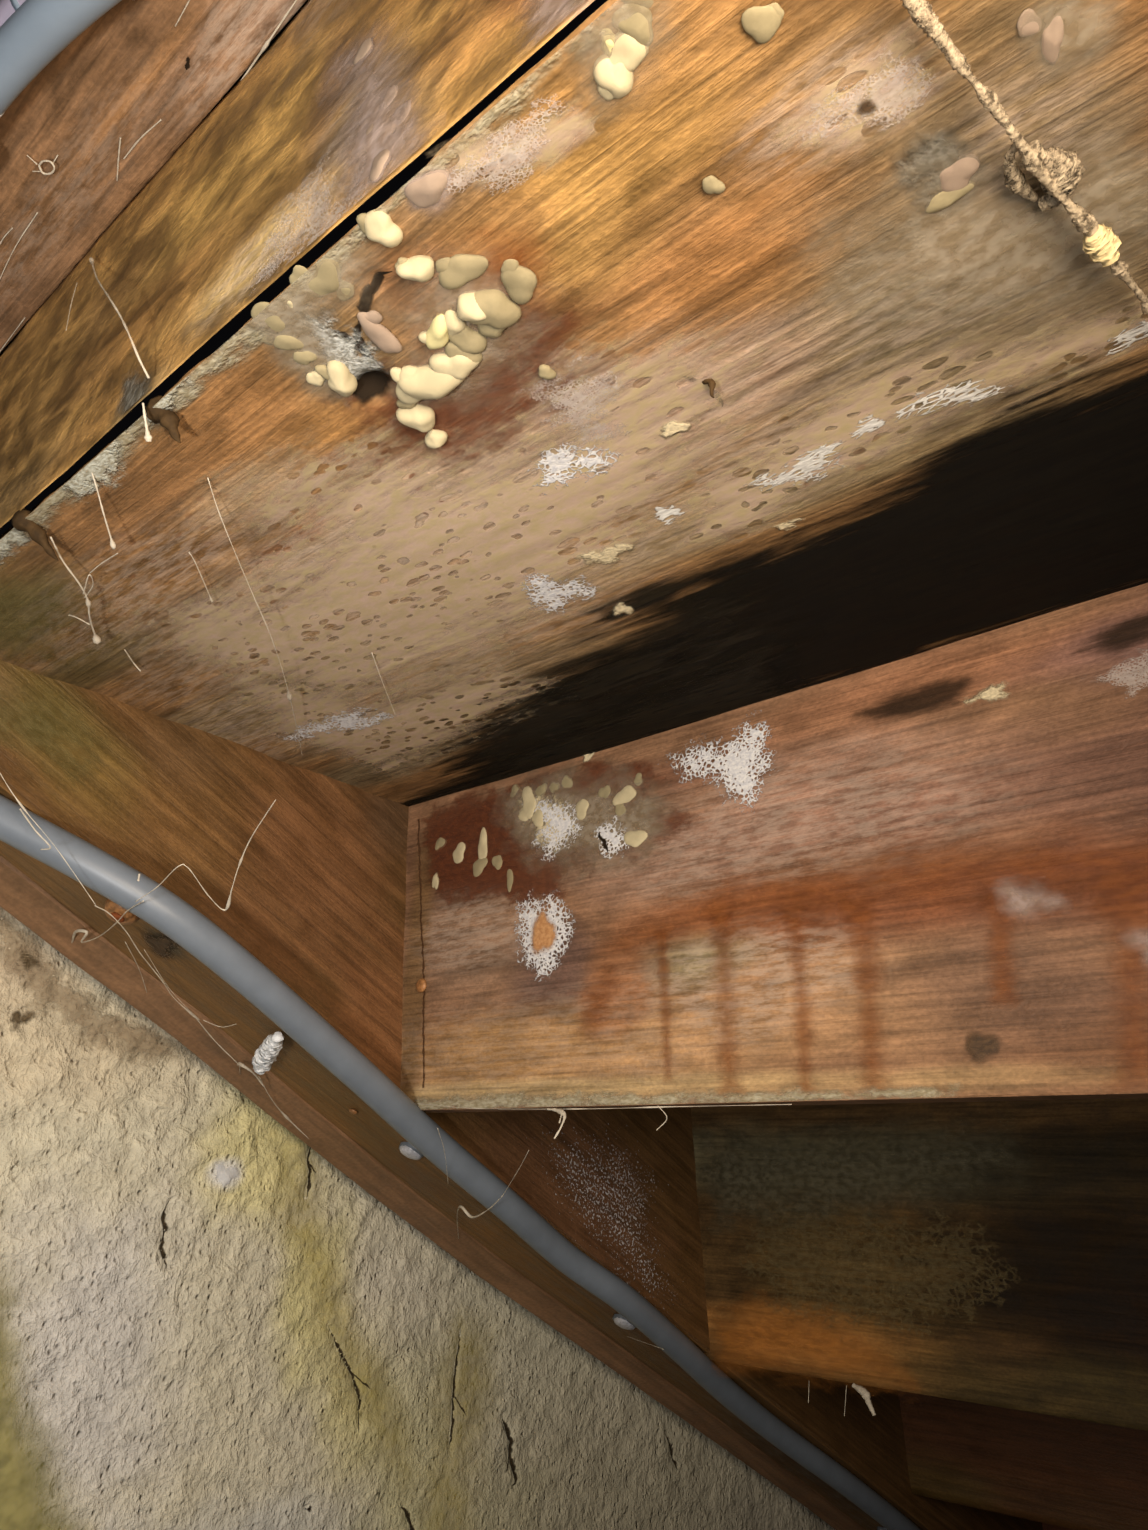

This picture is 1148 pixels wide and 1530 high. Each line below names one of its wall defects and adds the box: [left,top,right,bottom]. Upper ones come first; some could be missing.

water stain [894,135,1148,307]
water stain [118,375,193,423]
water stain [148,267,1148,982]
crack [159,1199,170,1268]
crack [328,1326,369,1432]
crack [449,1336,466,1454]
crack [502,1419,517,1489]